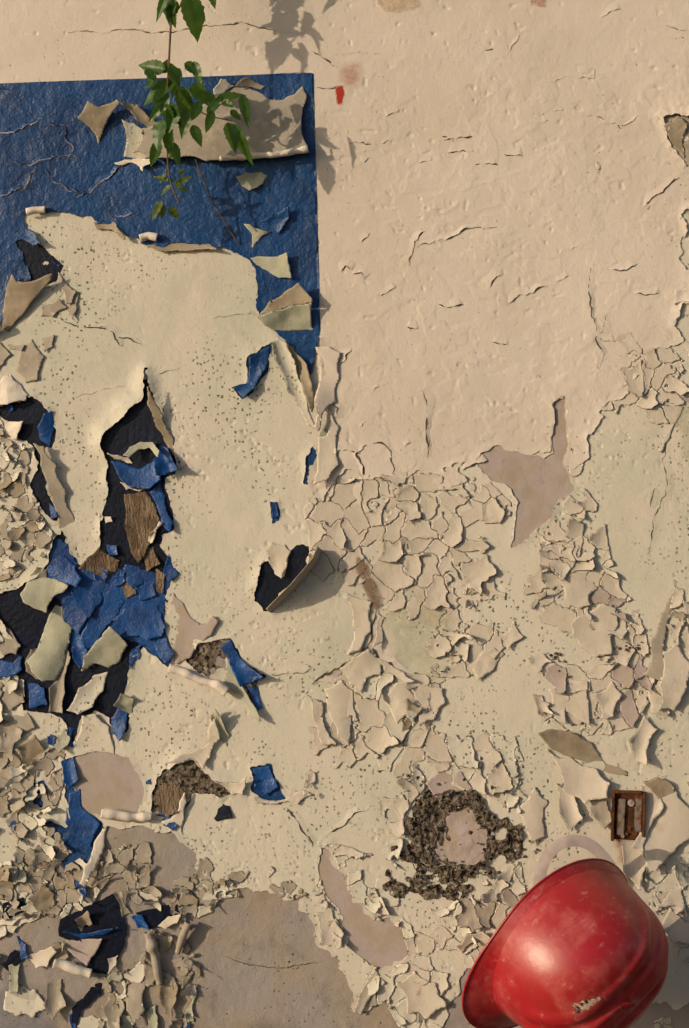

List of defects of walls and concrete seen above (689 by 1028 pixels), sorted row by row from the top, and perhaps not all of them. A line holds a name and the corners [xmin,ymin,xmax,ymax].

crack [70,16,296,34]
crack [314,49,350,103]
peeling [78,77,309,191]
peeling [663,113,689,167]
peeling [232,206,689,1028]